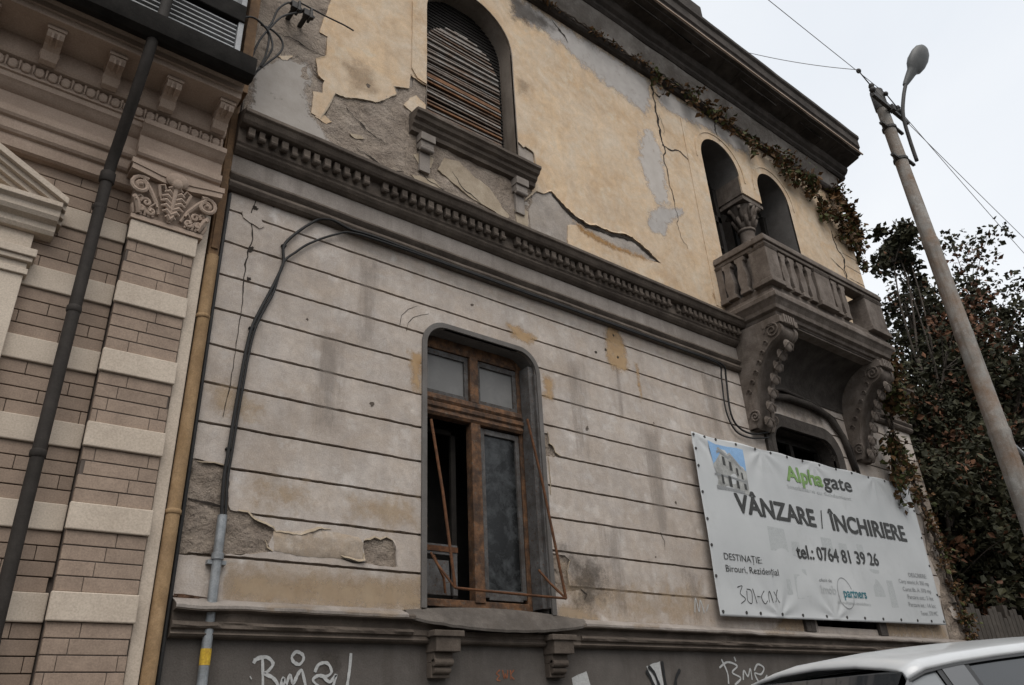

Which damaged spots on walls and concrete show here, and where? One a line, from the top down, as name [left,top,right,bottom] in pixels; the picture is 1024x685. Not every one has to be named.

spalling [244,0,661,263]
crack [552,194,659,263]
peeling [638,129,684,236]
crack [651,82,688,242]
crack [223,200,275,416]
spalling [179,459,276,554]
spalling [363,536,398,567]